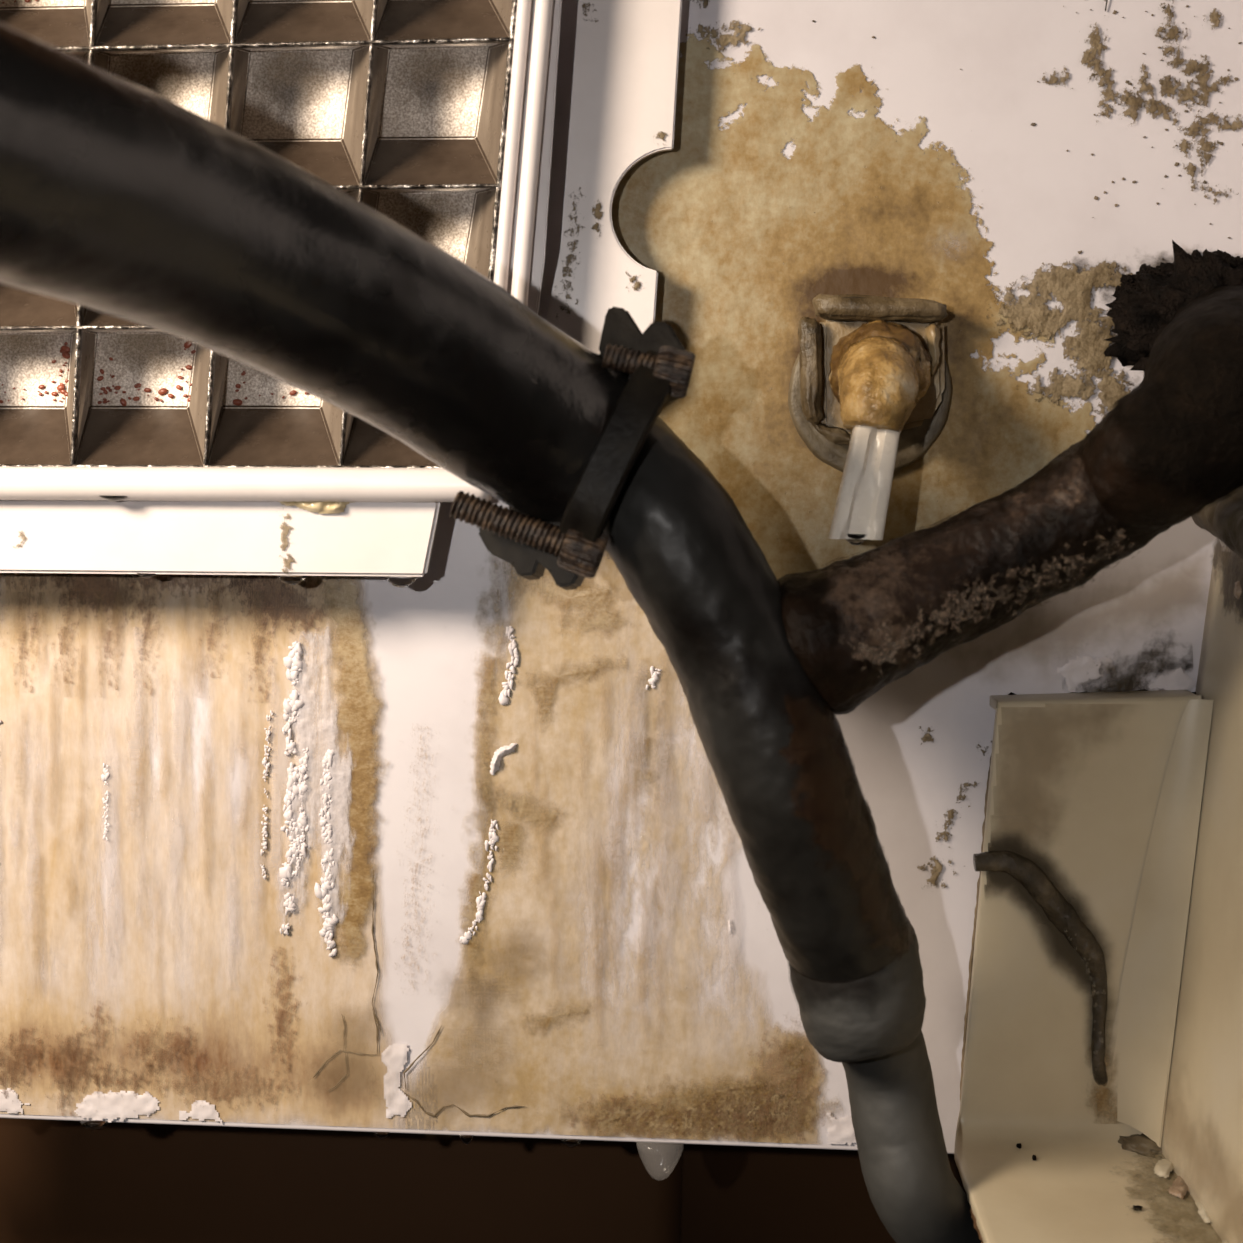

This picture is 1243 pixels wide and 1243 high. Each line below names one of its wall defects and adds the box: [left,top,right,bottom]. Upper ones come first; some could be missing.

leakage [612,0,1243,580]
leakage [0,550,834,1144]
leakage [917,782,977,888]
crack [313,870,382,1091]
crack [403,1028,525,1117]
mould [1125,1153,1229,1243]